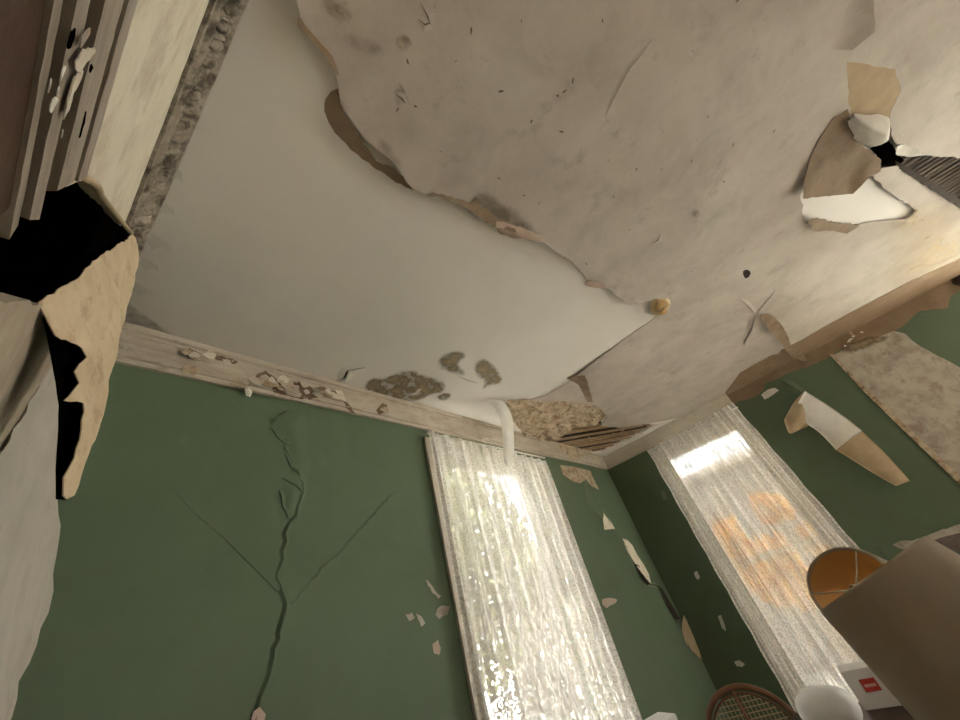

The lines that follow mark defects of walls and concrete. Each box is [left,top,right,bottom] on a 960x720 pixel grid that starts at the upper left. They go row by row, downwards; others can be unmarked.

spalling [62,28,96,120]
spalling [0,182,102,303]
peeling [180,348,238,365]
peeling [229,371,355,413]
leakage [366,372,450,401]
leakage [440,353,501,386]
flaking render [725,258,960,484]
flaking render [476,398,702,661]
peeling [426,580,450,619]